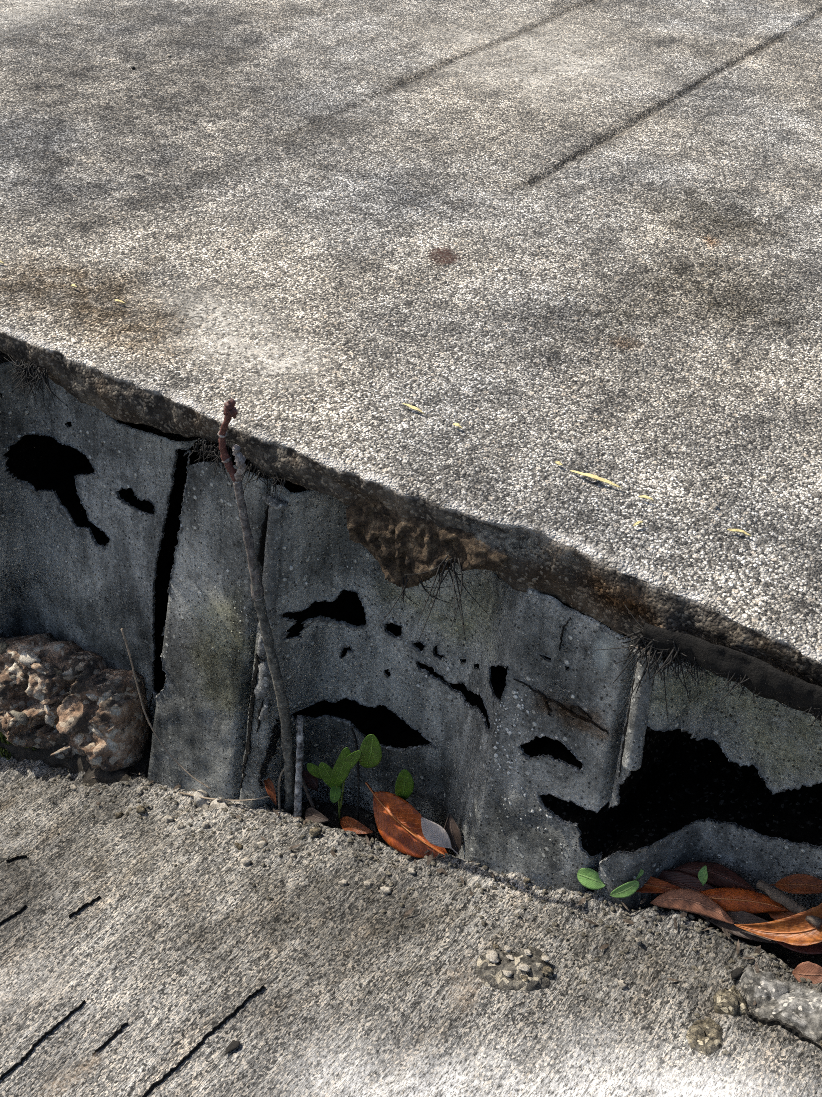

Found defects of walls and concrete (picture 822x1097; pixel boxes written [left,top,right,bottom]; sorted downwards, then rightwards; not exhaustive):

spalling [2,432,111,551]
spalling [114,438,203,702]
spalling [279,589,370,640]
spalling [290,698,438,752]
spalling [517,733,584,774]
spalling [535,770,822,865]
crack [0,1000,86,1081]
crack [142,985,265,1097]